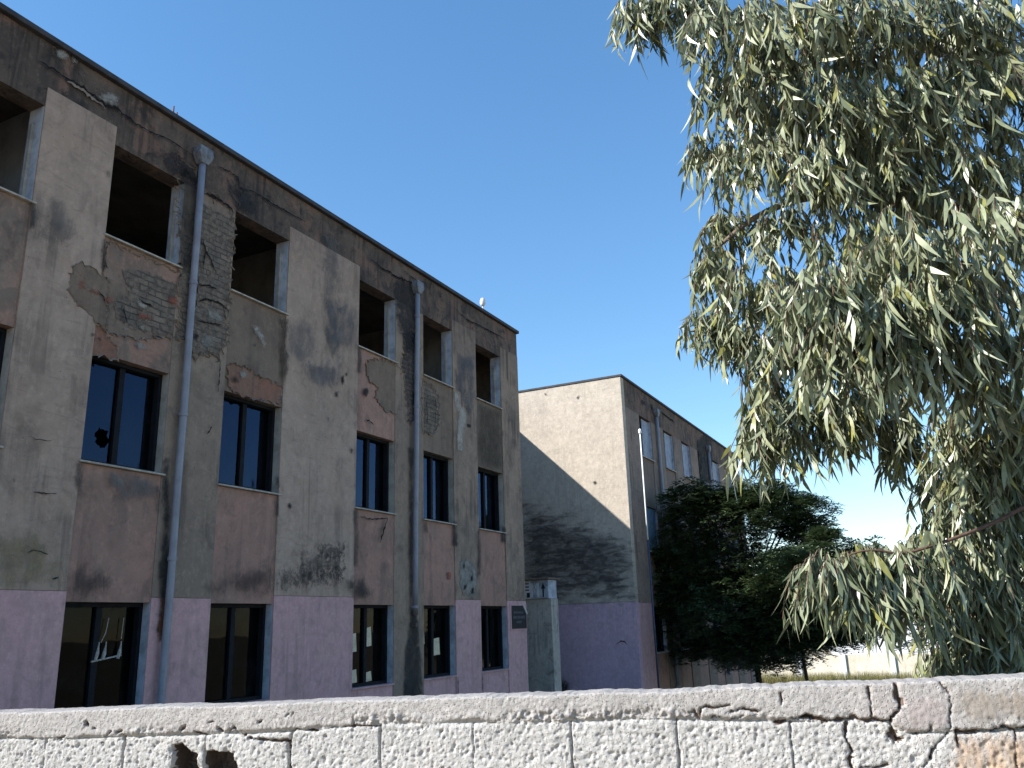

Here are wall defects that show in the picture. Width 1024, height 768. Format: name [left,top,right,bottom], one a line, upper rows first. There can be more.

crack [38,60,192,155]
crack [207,167,305,222]
spalling [66,153,283,406]
peeling [364,330,441,436]
damp [526,516,634,598]
spalling [173,721,247,768]
crack [780,681,1024,768]